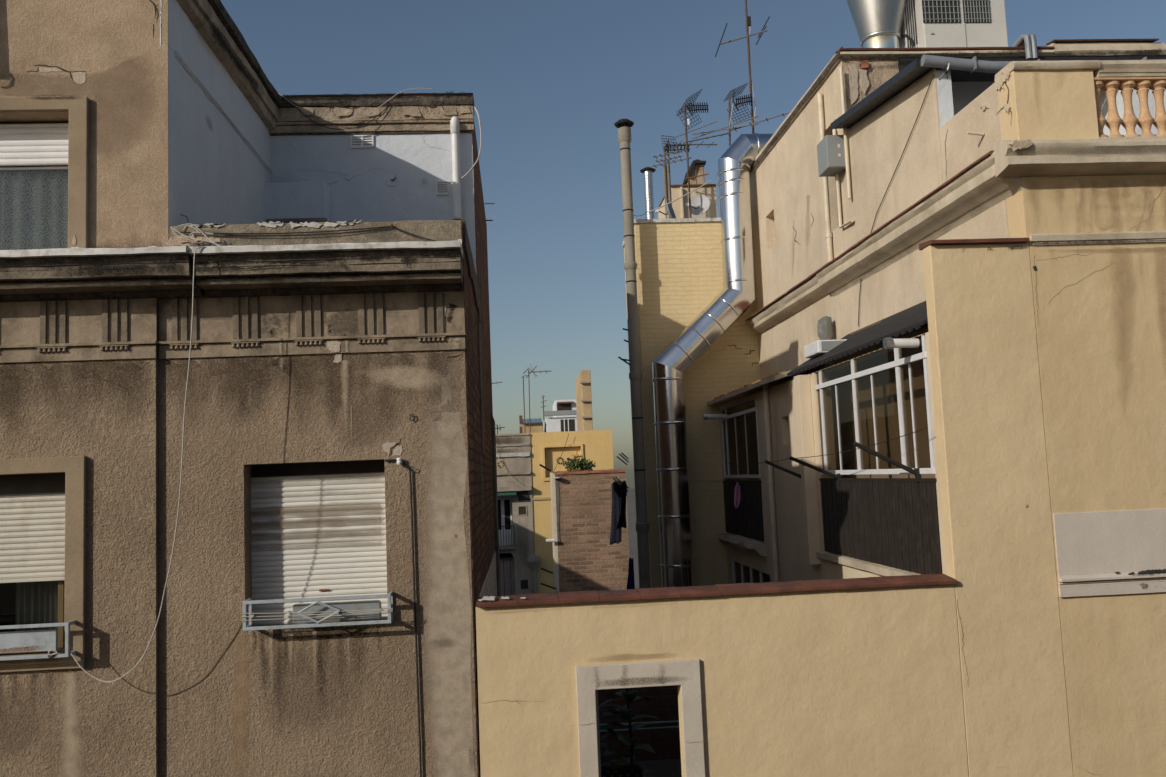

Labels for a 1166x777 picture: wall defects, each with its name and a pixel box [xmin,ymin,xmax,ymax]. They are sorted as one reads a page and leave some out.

crack [1034,253,1113,324]
leakage [1010,174,1166,426]
leakage [228,337,475,777]